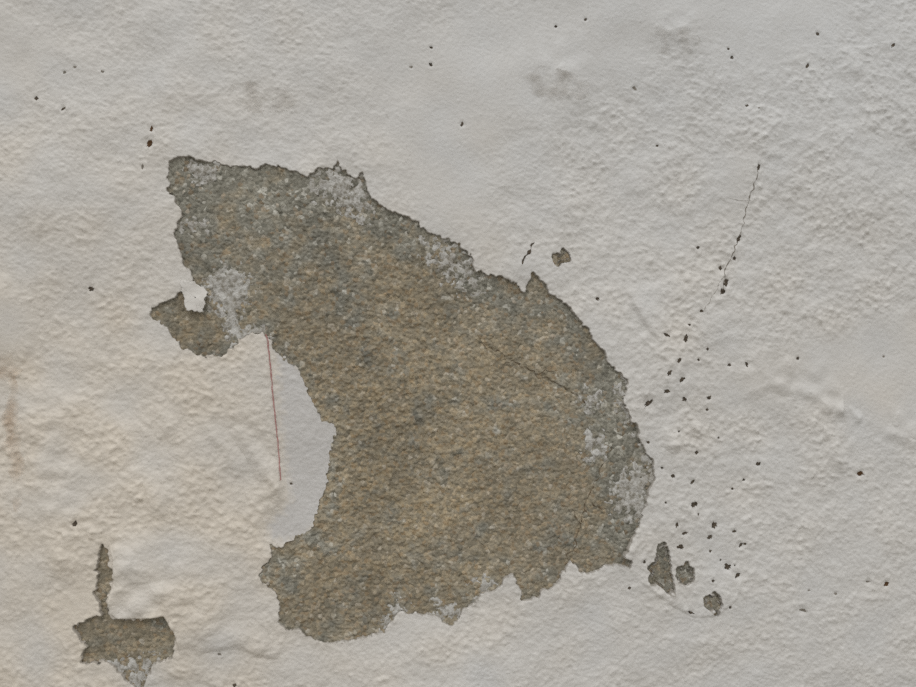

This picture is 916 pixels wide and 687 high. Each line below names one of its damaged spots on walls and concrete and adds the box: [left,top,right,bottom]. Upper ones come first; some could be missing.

crack [705,164,760,308]
peeling [150,157,655,642]
peeling [74,525,251,687]
peeling [647,542,693,593]
peeling [703,591,721,615]